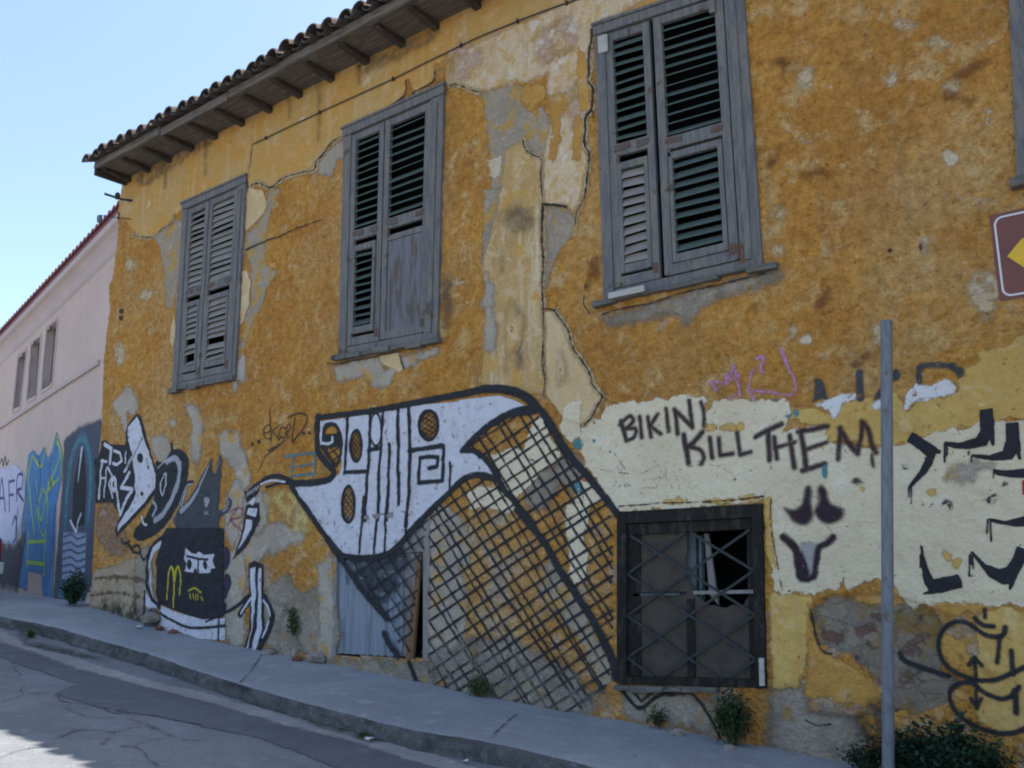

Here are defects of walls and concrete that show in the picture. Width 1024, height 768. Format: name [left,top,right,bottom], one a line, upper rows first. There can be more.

crack [247,133,343,191]
crack [131,213,176,240]
flaking render [139,218,182,348]
flaking render [232,188,280,392]
crack [245,219,322,251]
flaking render [481,81,550,352]
flaking render [542,205,575,289]
crack [520,27,612,428]
flaking render [601,243,786,327]
flaking render [332,348,440,389]
flaking render [90,547,159,627]
flaking render [813,595,958,715]